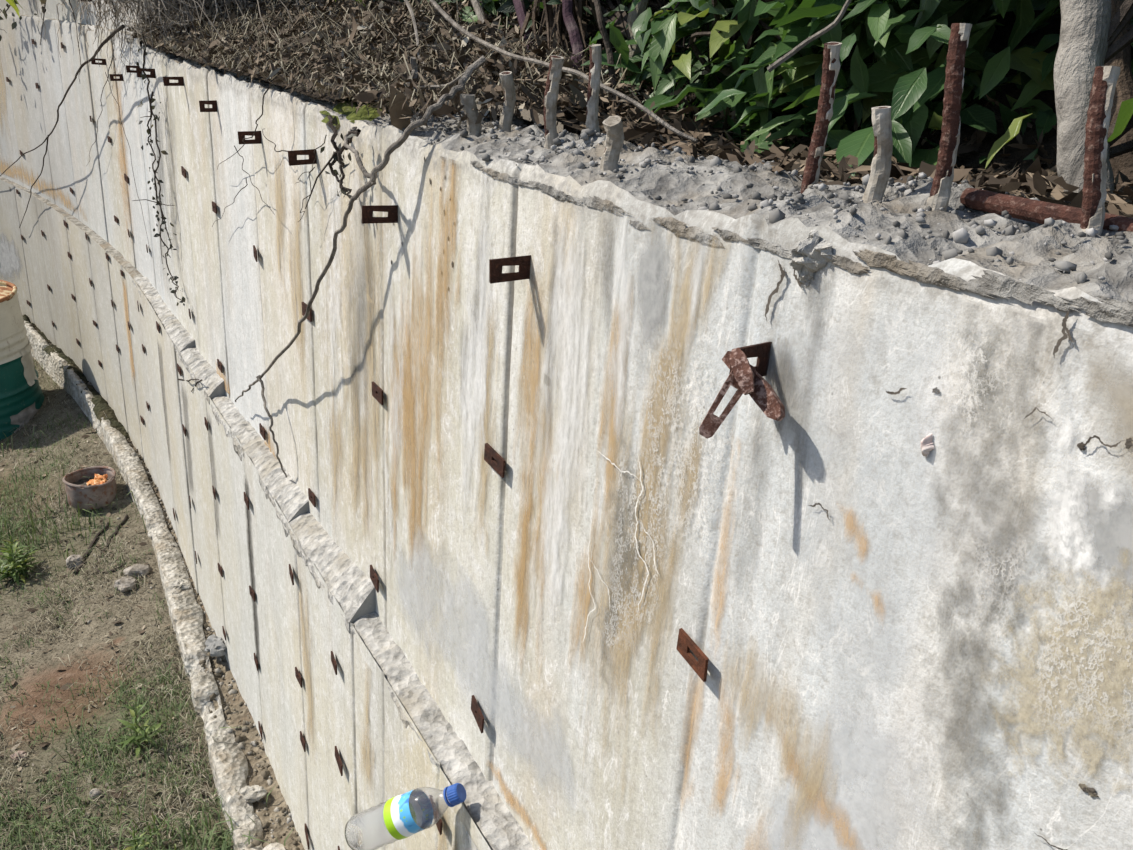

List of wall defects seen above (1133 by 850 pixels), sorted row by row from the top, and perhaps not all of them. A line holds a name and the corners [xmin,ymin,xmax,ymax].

rust [330,247,378,495]
rust [391,161,456,539]
rust [480,326,492,507]
rust [577,259,711,701]
spalling [470,161,1133,327]
leakage [949,423,1133,774]